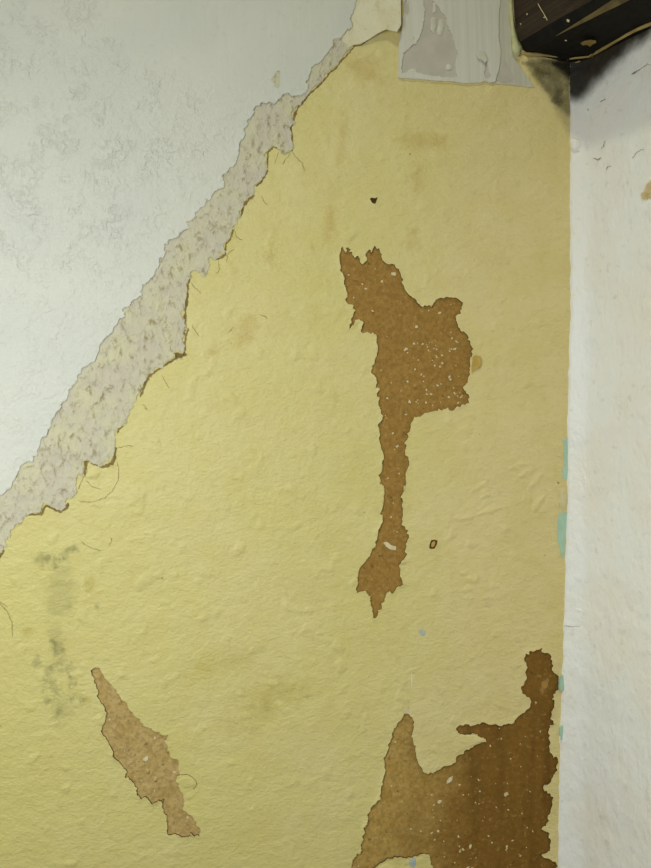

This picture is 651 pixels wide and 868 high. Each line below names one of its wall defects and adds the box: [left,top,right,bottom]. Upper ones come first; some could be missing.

peeling [401,0,458,78]
peeling [339,246,481,617]
peeling [91,668,200,837]
peeling [351,650,564,868]